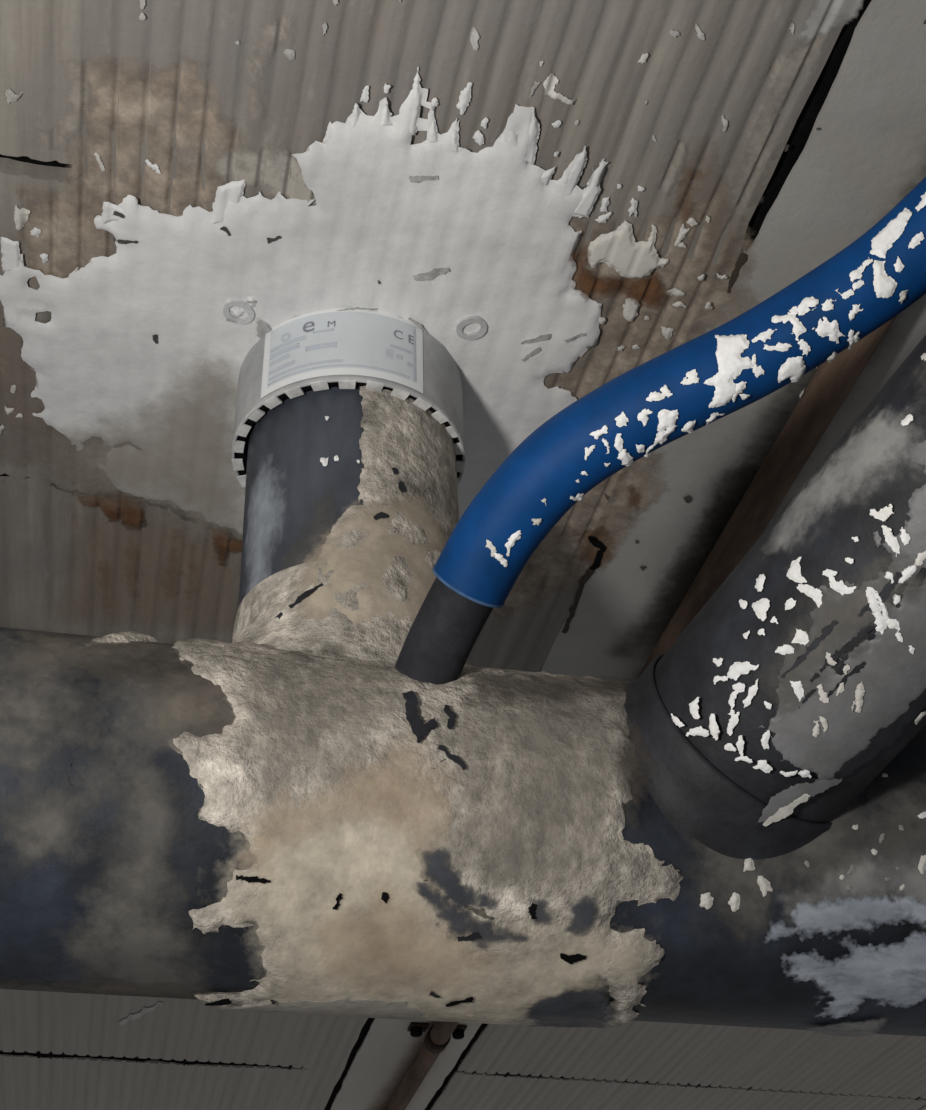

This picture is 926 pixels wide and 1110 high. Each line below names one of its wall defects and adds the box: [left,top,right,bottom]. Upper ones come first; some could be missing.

crack [0,154,71,168]
damp [22,61,241,280]
crack [727,0,872,293]
spalling [413,268,450,281]
corrosion [572,250,668,307]
spalling [257,320,271,339]
spalling [521,334,551,362]
peeling [392,467,407,492]
crack [0,474,195,523]
corrosion [77,490,145,525]
corrosion [210,527,242,566]